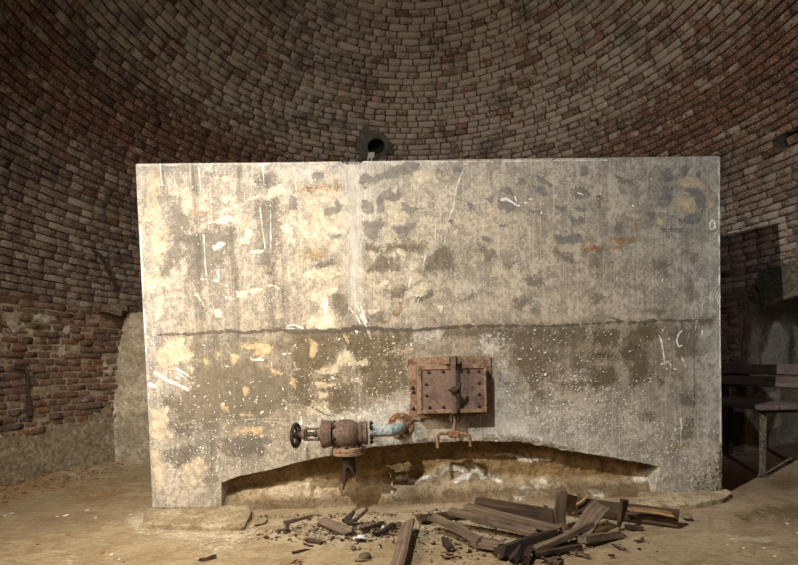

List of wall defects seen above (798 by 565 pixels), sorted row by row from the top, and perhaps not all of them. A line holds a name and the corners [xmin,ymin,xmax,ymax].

peeling [0,314,25,344]
peeling [57,325,72,358]
damp [139,227,154,361]
damp [165,291,666,468]
damp [363,218,484,300]
damp [661,280,721,444]